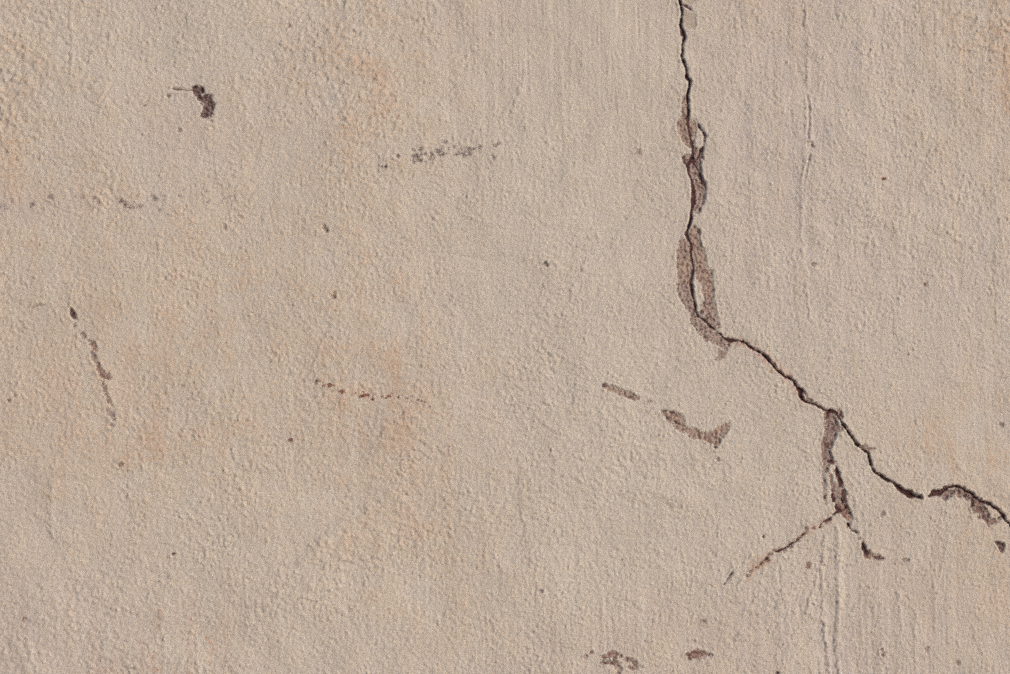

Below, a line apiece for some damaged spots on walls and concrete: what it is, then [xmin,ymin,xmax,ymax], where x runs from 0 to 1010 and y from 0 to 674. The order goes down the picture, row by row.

flaking render [167,85,215,122]
crack [679,0,1010,526]
peeling [602,384,730,462]
crack [724,459,868,584]